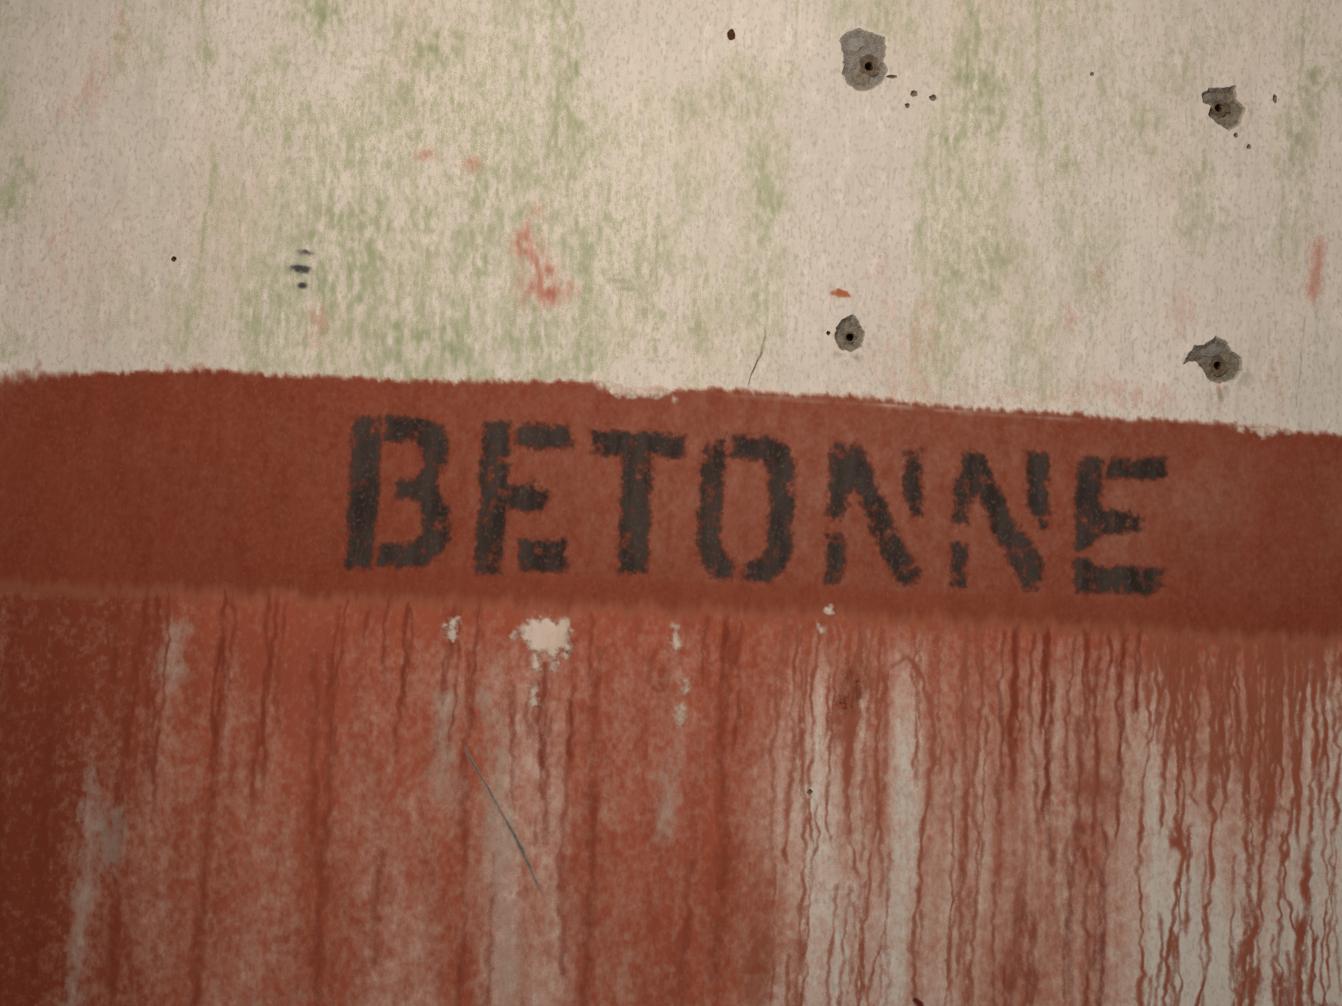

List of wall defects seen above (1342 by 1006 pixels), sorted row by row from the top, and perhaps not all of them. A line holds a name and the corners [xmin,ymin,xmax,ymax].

peeling [510,616,573,706]